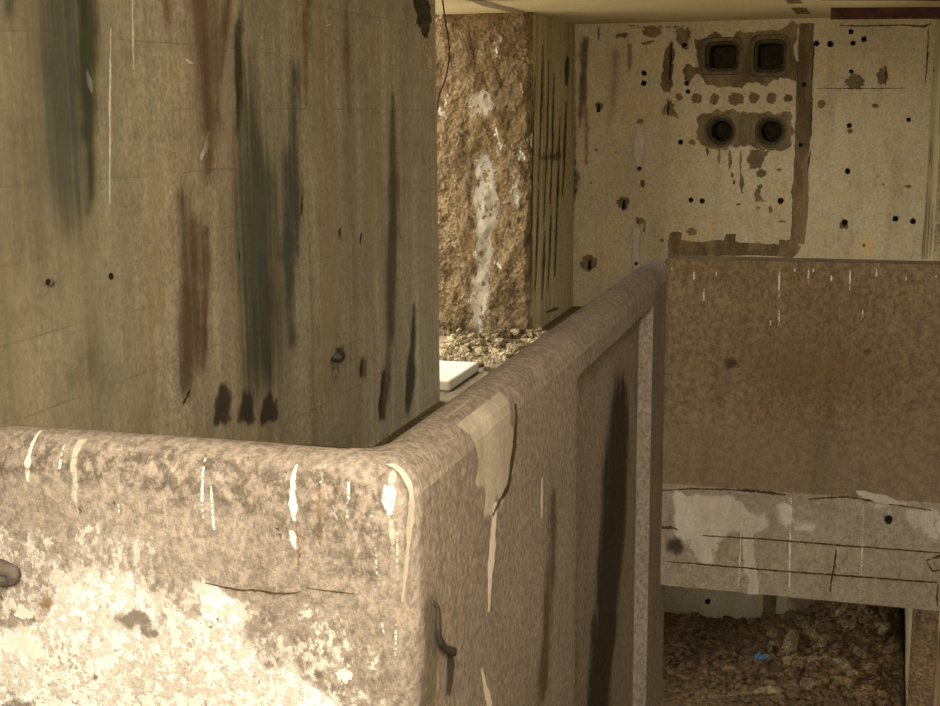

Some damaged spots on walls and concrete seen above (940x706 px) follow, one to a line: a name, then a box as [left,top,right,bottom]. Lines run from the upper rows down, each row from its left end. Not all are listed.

water stain [46,0,97,218]
water stain [180,192,209,389]
water stain [214,19,299,425]
water stain [378,362,390,420]
water stain [387,95,398,344]
water stain [406,304,416,414]
spalling [413,0,533,339]
peeling [616,0,826,264]
peeling [0,522,386,706]
crack [205,582,353,595]